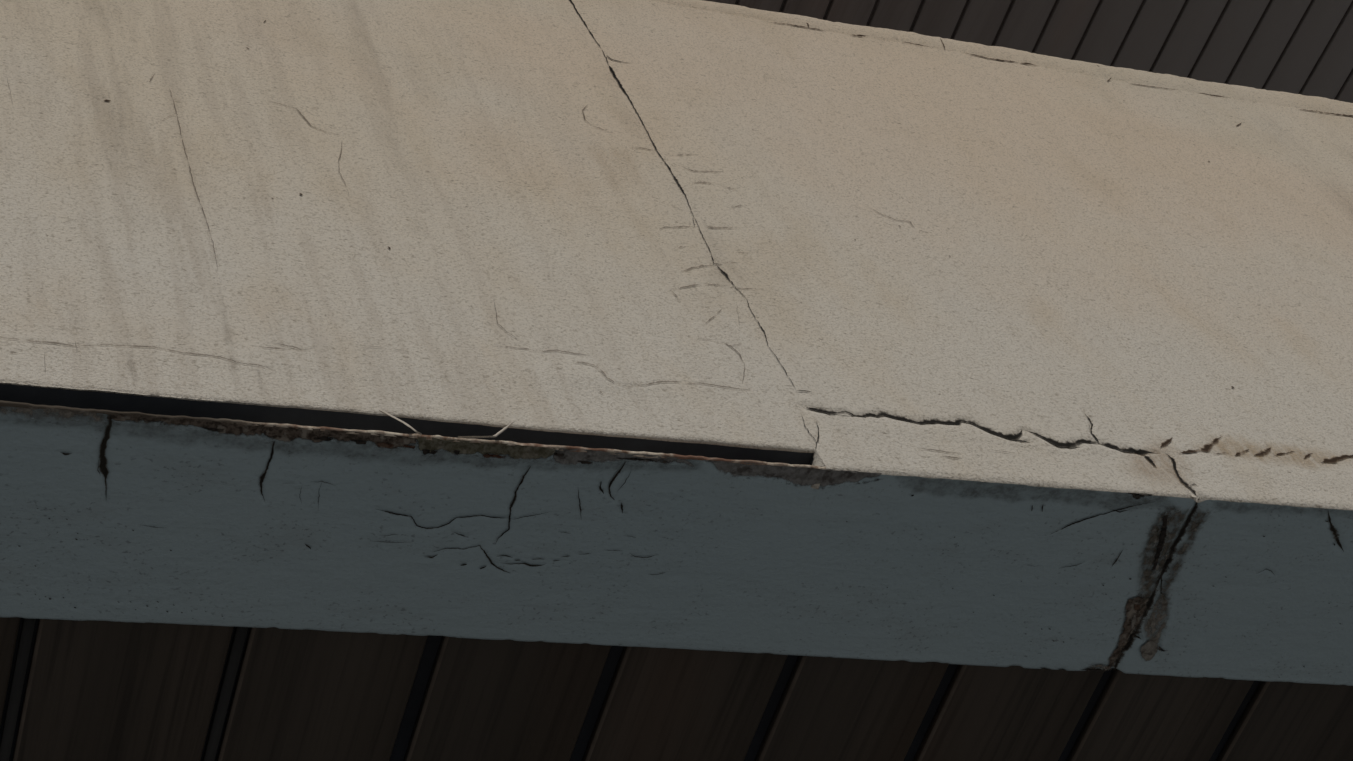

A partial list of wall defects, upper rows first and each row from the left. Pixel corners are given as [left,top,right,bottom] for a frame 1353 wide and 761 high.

crack [494,0,1353,496]
crack [97,415,112,492]
crack [260,441,275,501]
crack [377,466,543,542]
spalling [108,413,882,487]
crack [578,461,630,514]
crack [1054,502,1152,533]
crack [1326,511,1344,552]